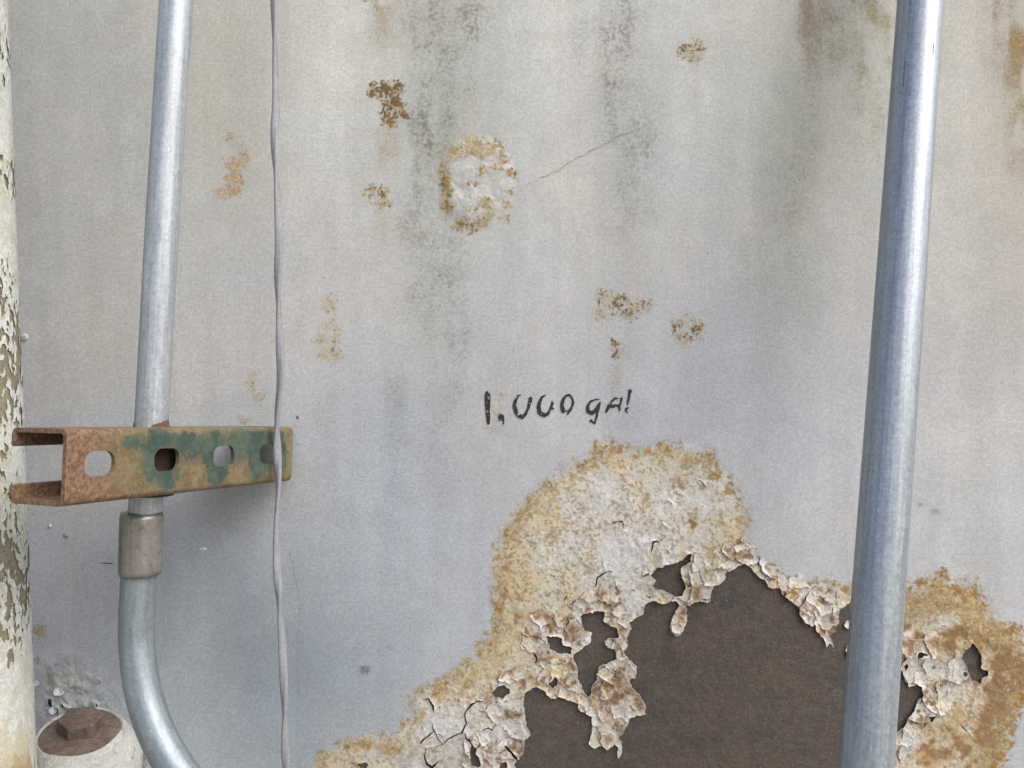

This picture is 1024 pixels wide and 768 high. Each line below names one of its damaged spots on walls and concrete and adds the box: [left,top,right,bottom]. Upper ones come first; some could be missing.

corrosion [679,40,706,61]
corrosion [366,79,410,127]
corrosion [217,153,249,196]
corrosion [362,184,393,209]
corrosion [437,135,517,234]
crack [527,119,654,185]
corrosion [595,288,651,319]
corrosion [672,314,704,345]
peeling [290,429,853,768]
peeling [895,557,1024,768]